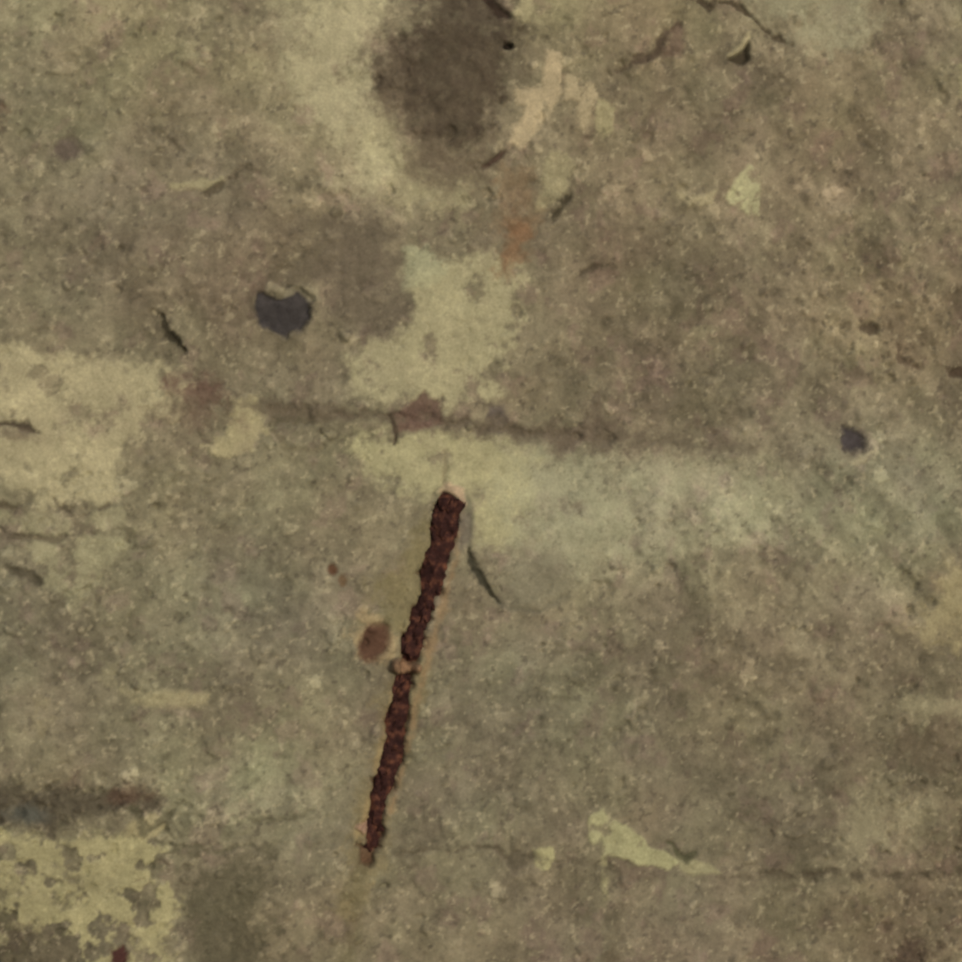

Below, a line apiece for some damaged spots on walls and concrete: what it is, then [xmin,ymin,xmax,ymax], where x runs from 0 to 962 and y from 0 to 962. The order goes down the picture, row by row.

crack [611,0,797,78]
peeling [511,46,618,156]
peeling [246,0,539,417]
water stain [275,0,541,357]
peeling [537,145,578,205]
crack [156,310,189,355]
peeling [194,418,270,463]
crack [141,382,860,487]
crack [465,543,497,607]
peeling [338,423,714,873]
corrosion [314,488,466,962]